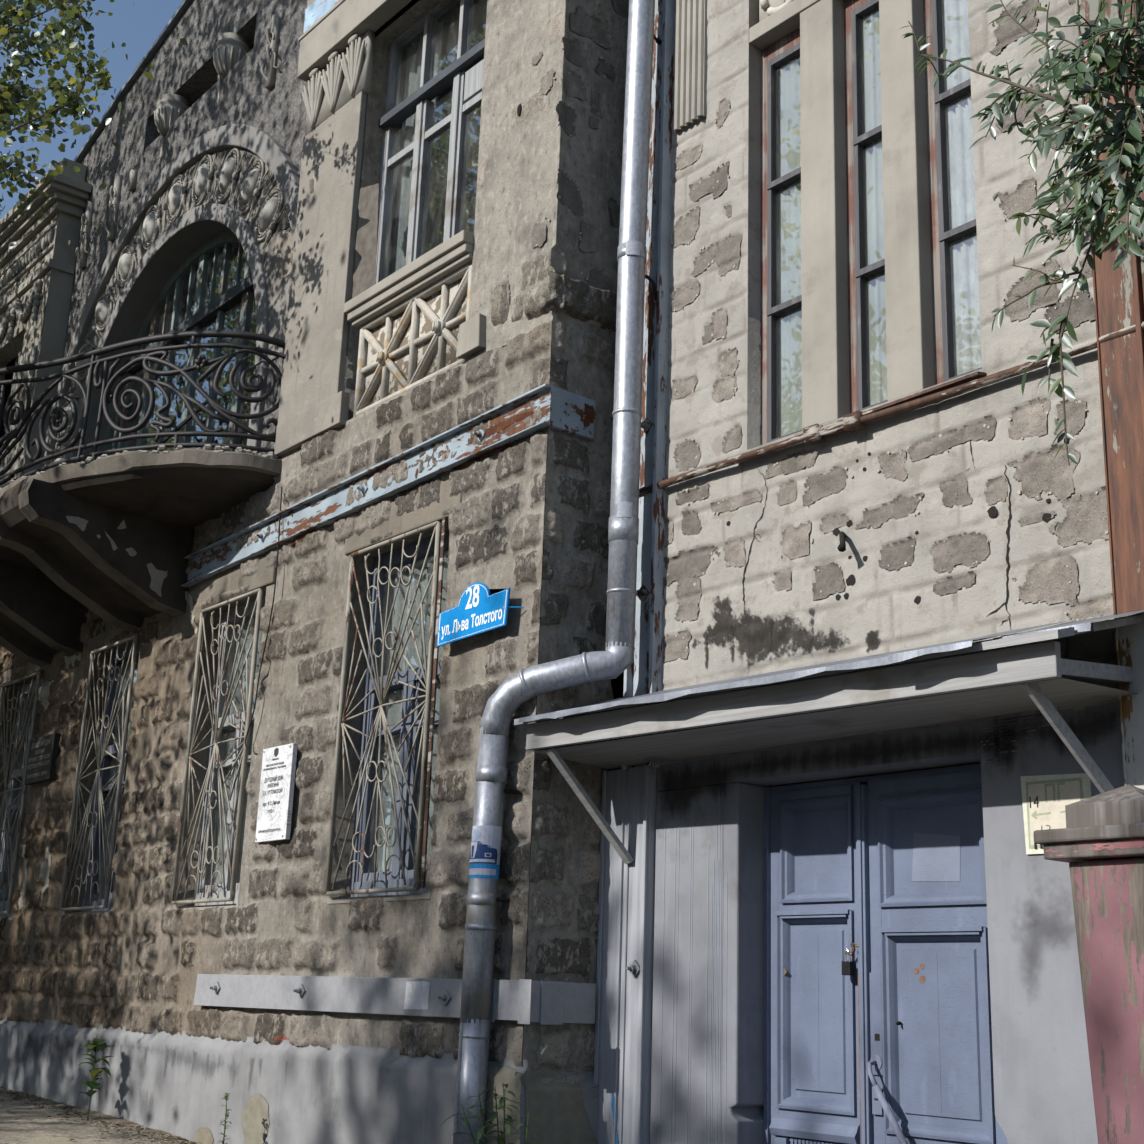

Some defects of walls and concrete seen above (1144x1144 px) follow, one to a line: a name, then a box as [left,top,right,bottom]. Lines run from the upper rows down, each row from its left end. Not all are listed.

peeling [66,516,137,556]
peeling [147,563,168,597]
crack [742,468,768,615]
leakage [692,596,848,668]
spalling [662,397,1114,662]
crack [987,466,1011,629]